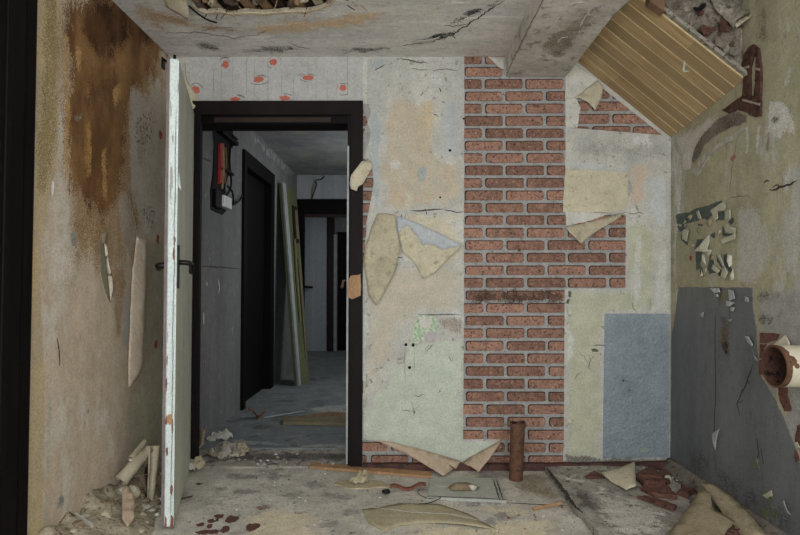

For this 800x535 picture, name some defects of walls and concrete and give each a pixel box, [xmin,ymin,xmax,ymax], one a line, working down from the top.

spalling [164,0,336,20]
crack [374,1,504,92]
leakage [34,0,390,351]
crack [764,180,796,191]
peeling [101,231,113,301]
peeling [676,200,736,322]
crack [736,367,752,416]